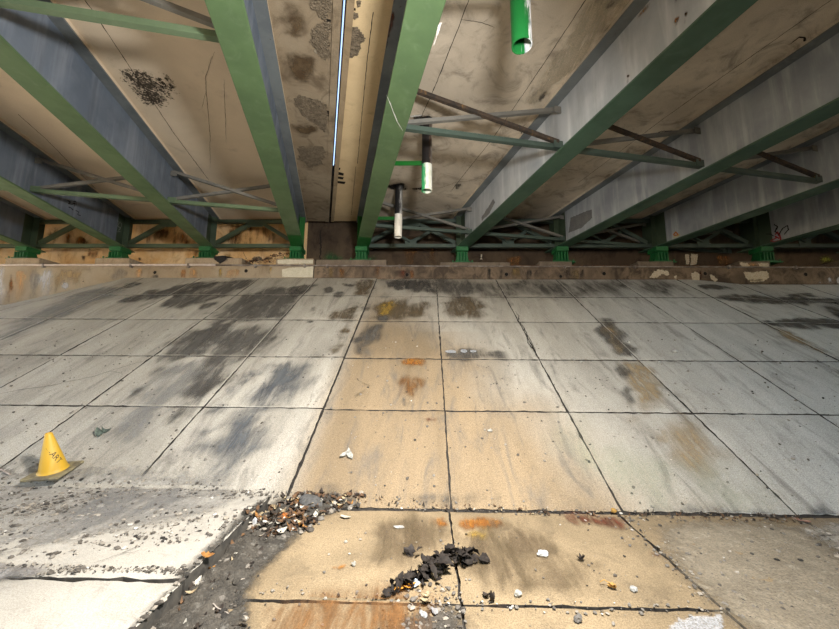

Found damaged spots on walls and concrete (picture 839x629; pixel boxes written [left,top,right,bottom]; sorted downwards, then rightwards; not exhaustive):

spalling [309,0,332,60]
spalling [294,95,329,132]
spalling [297,146,326,167]
leakage [383,269,627,317]
peeling [685,254,718,282]
peeling [740,262,769,282]
leakage [2,270,374,436]
leakage [329,307,382,353]
leakage [447,349,503,361]
leakage [597,319,660,402]
rust [400,378,422,394]
leakage [204,364,306,468]